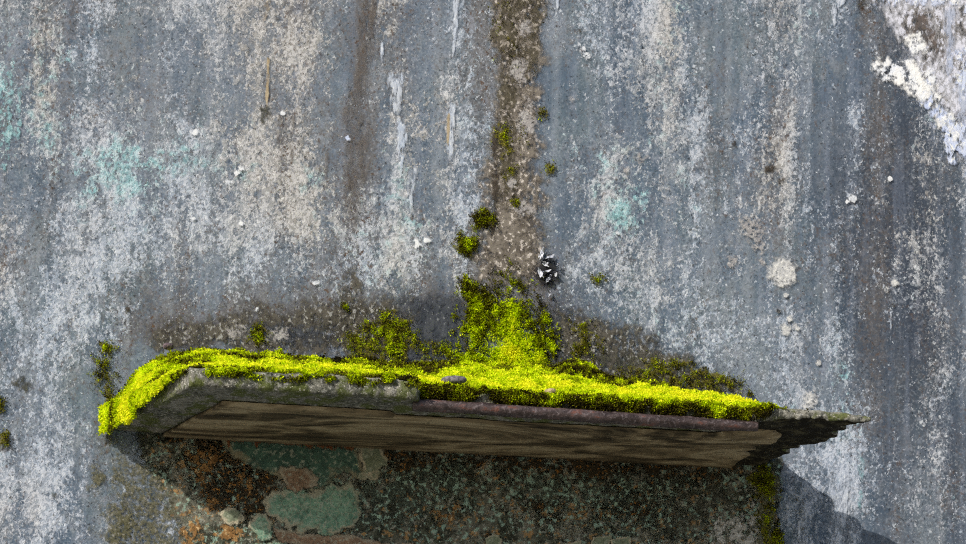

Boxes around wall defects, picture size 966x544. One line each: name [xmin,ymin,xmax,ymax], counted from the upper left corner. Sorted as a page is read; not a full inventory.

water stain [149,0,559,362]
peeling [217,440,390,544]
peeling [566,535,632,544]